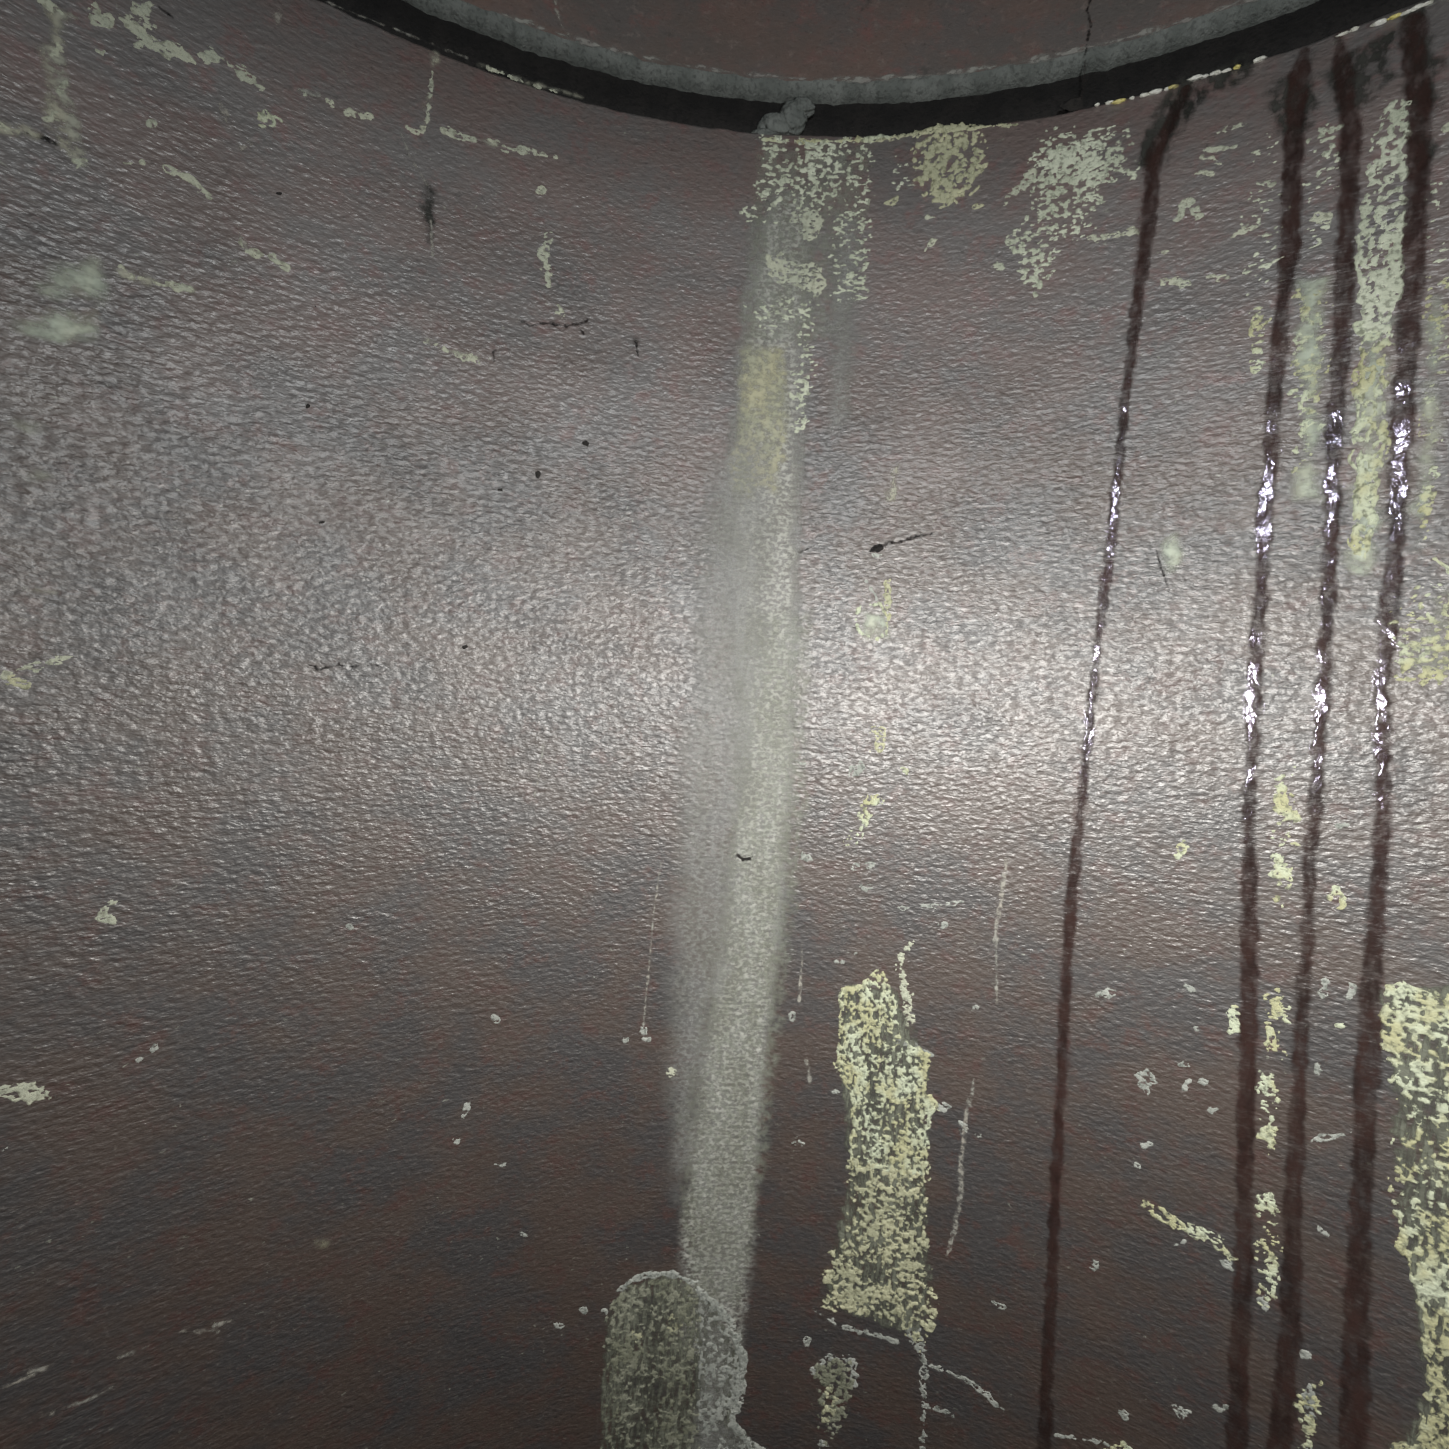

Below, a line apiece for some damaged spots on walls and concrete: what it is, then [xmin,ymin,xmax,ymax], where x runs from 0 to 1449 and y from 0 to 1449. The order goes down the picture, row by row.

crack [1081,0,1092,99]
damp [677,122,1018,1363]
damp [993,0,1449,1449]
peeling [1390,557,1449,686]
peeling [622,1027,651,1043]
peeling [579,1270,766,1449]
peeling [810,941,981,1449]
peeling [1378,981,1449,1449]